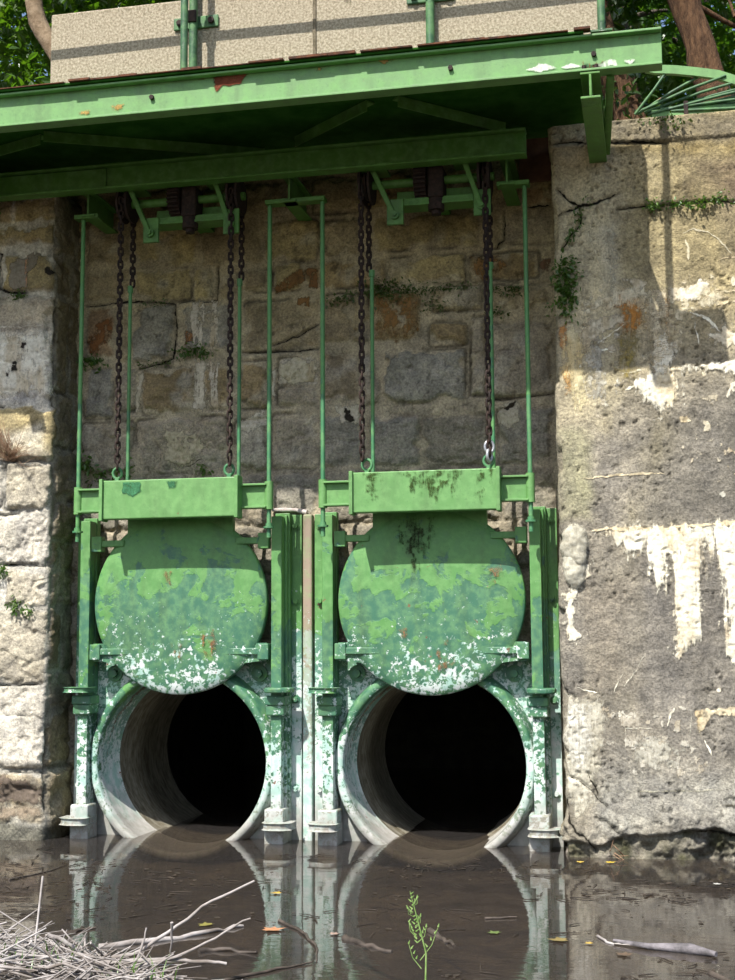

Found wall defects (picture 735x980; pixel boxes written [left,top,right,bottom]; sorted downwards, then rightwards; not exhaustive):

corrosion [0,26,590,91]
crack [528,190,730,248]
corrosion [615,298,649,379]
damp [622,296,735,421]
damp [559,560,594,645]
damp [592,518,735,663]
spalling [563,687,735,818]